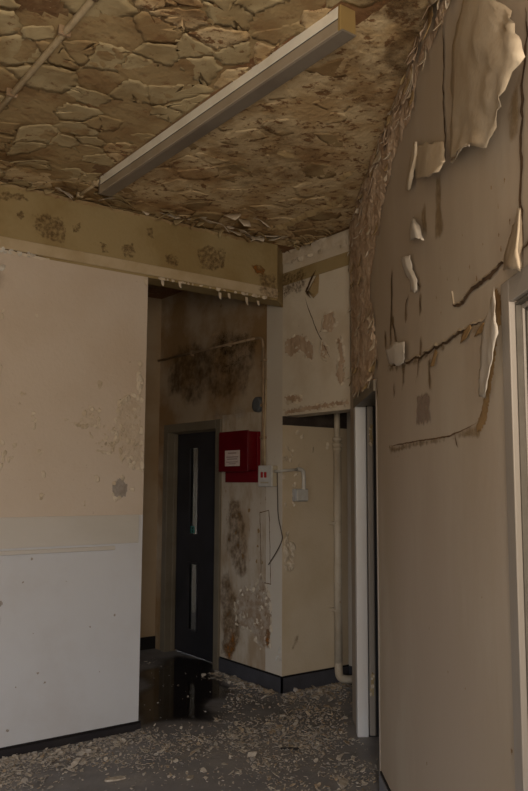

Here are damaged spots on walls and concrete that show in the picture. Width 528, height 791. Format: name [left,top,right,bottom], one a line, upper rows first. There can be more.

peeling [0,0,451,415]
crack [451,260,504,307]
crack [519,8,528,248]